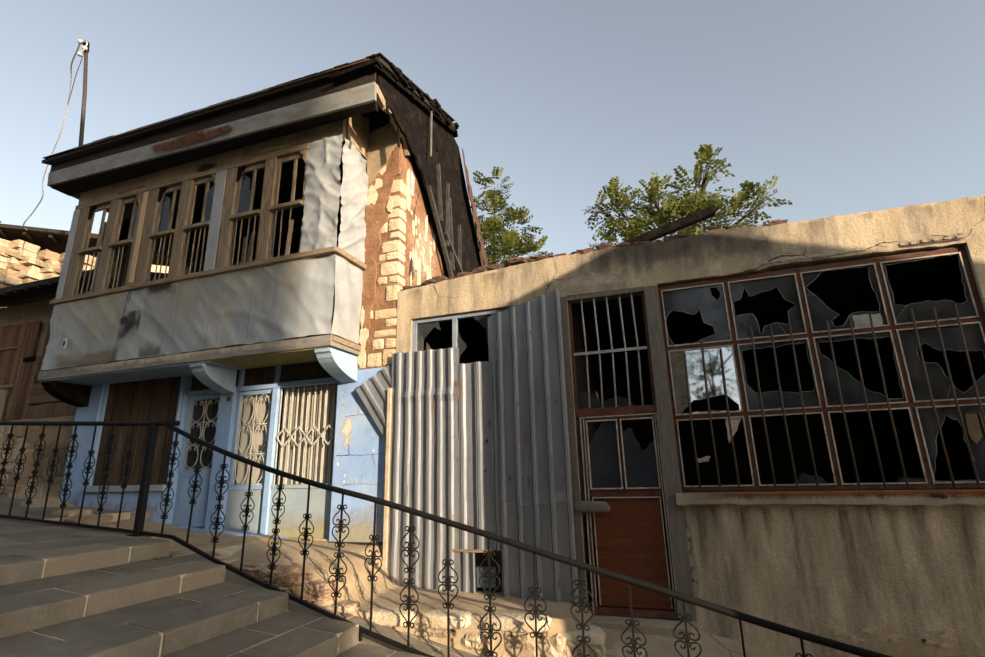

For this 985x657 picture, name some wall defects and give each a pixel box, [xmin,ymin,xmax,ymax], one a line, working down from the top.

flaking render [358,84,436,367]
crack [738,221,982,274]
peeling [341,400,363,446]